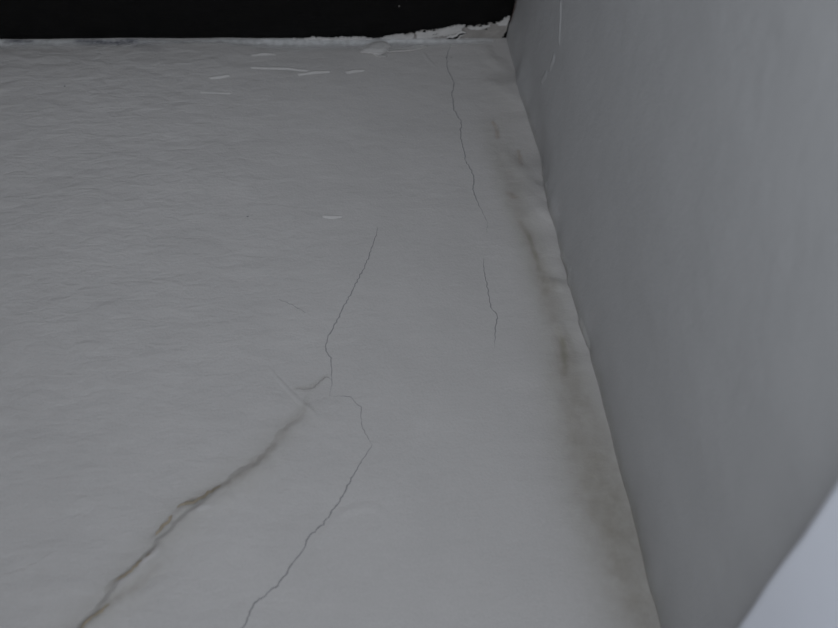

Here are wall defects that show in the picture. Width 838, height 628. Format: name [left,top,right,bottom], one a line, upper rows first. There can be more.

crack [432,31,487,233]
crack [483,258,499,347]
crack [241,228,378,628]